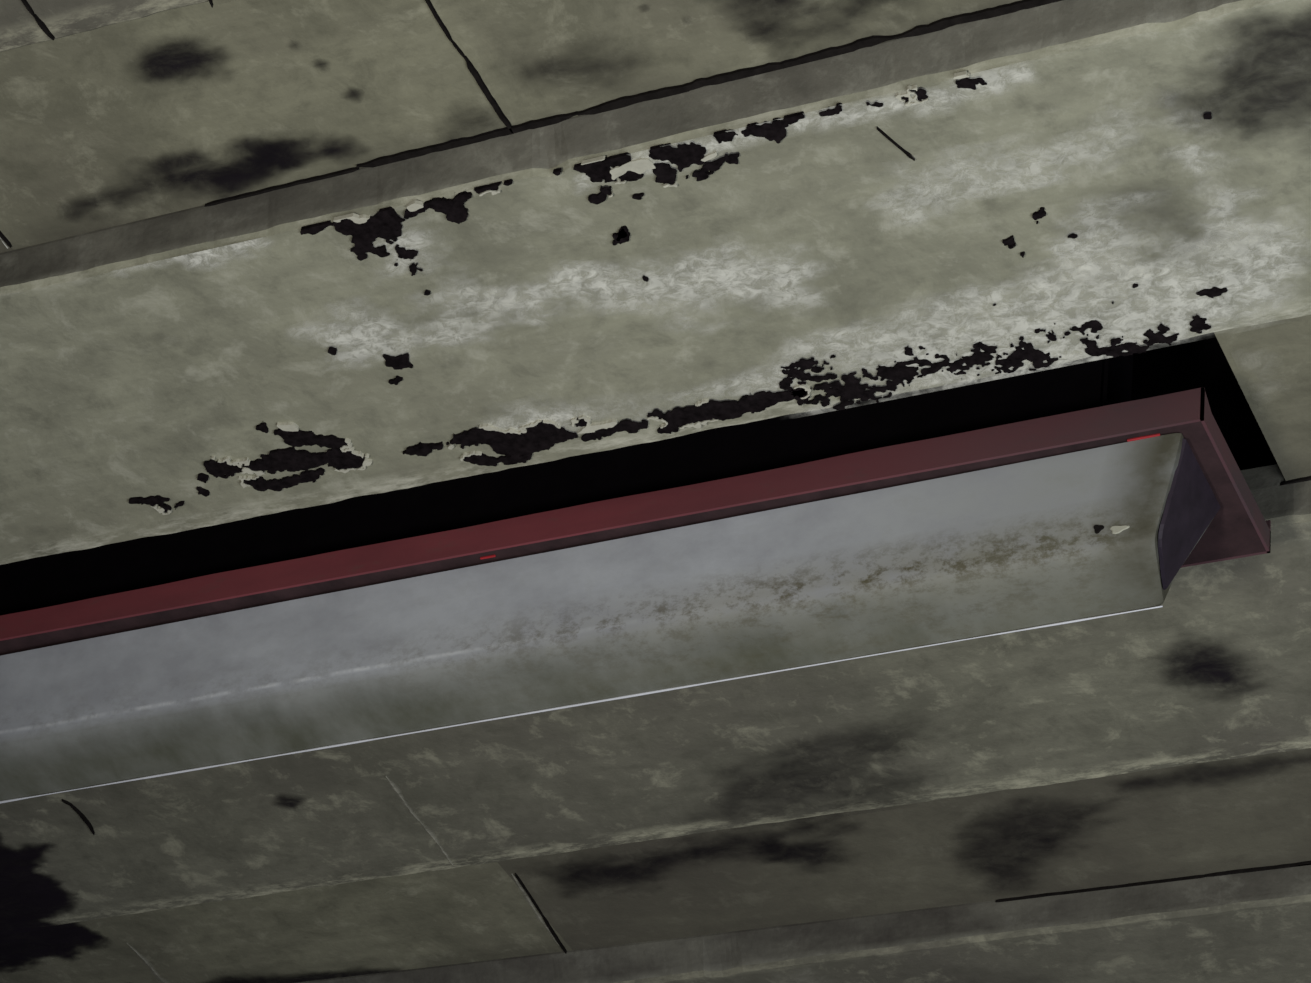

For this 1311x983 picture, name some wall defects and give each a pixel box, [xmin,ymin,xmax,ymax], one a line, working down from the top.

crack [21,0,55,40]
crack [204,0,1062,207]
peeling [953,71,987,90]
peeling [553,103,842,205]
crack [0,231,12,248]
peeling [300,179,513,276]
peeling [612,225,630,245]
peeling [1196,285,1228,298]
peeling [383,352,413,385]
peeling [403,313,1211,467]
peeling [196,422,372,497]
water stain [0,843,104,971]